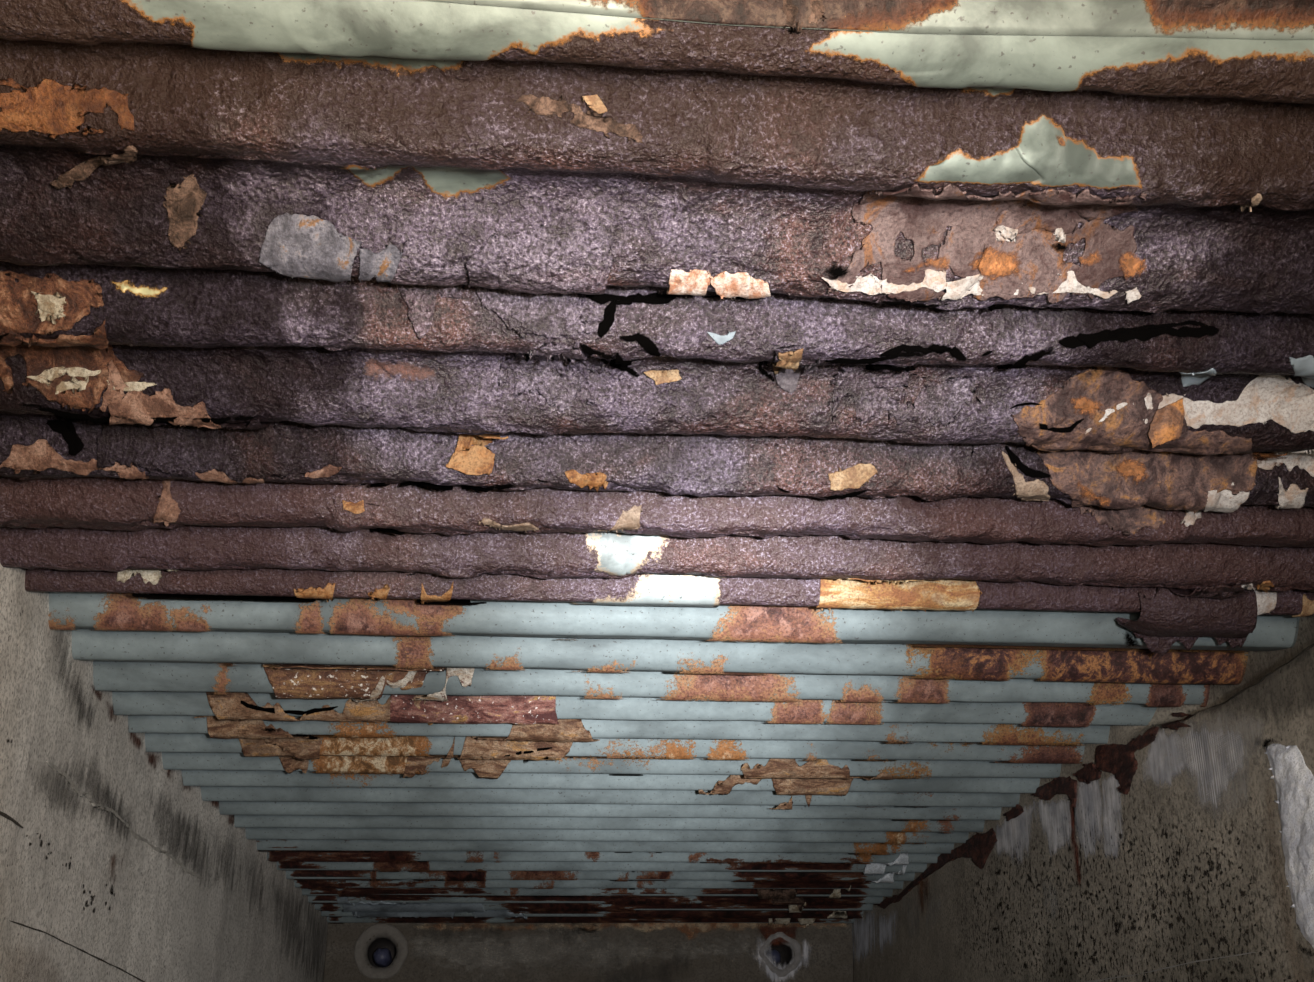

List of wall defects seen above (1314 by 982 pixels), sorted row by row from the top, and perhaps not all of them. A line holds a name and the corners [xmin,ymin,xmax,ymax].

corrosion [584,0,958,31]
corrosion [1144,0,1314,35]
corrosion [388,224,615,339]
peeling [822,264,1142,304]
peeling [26,361,157,394]
peeling [1079,355,1314,434]
peeling [1252,449,1314,509]
corrosion [256,580,1275,945]
crack [0,811,23,828]
efflorescence [997,775,1121,859]
leakage [1148,674,1314,949]
crack [9,920,145,982]